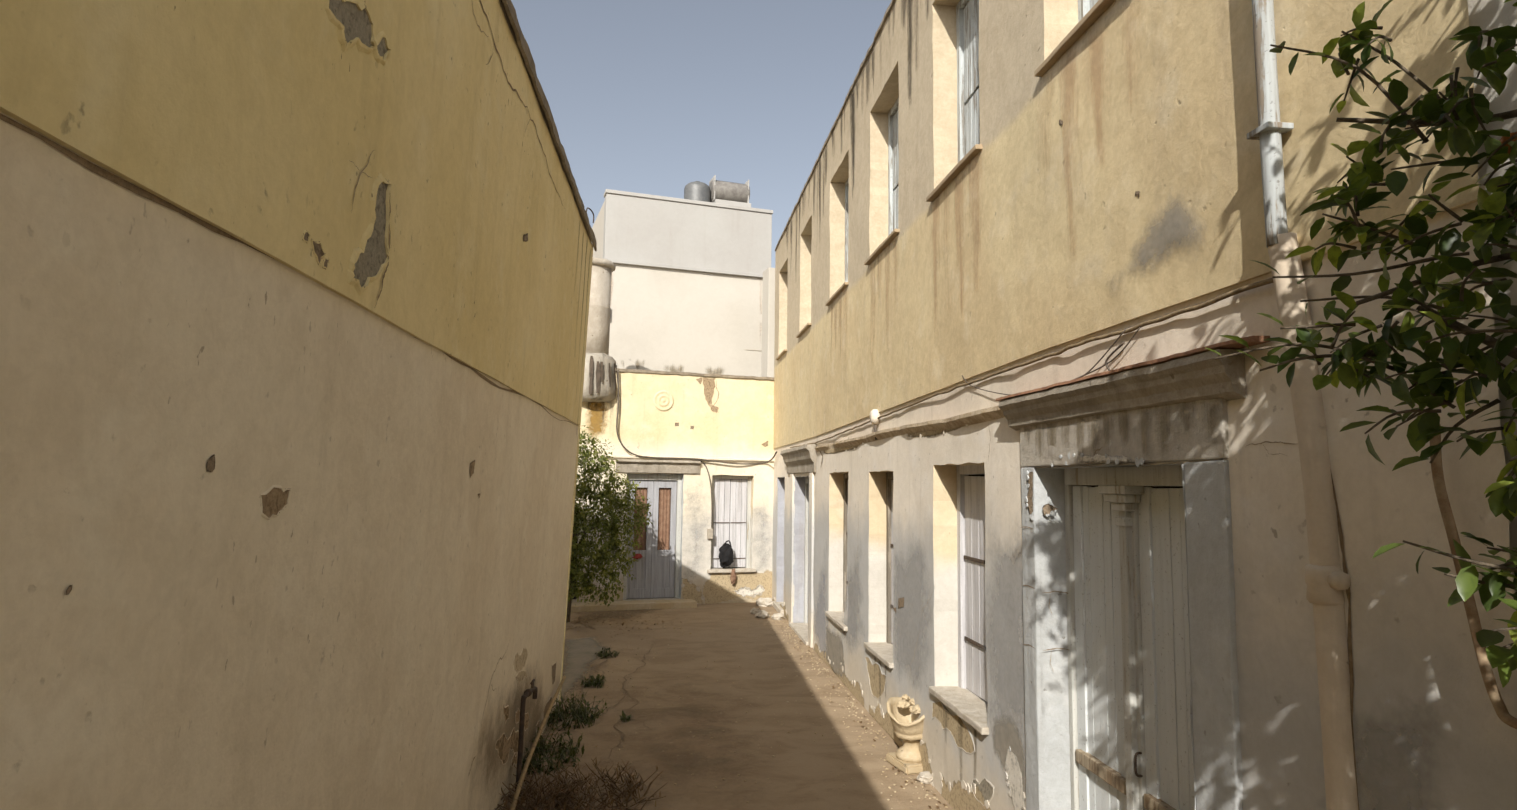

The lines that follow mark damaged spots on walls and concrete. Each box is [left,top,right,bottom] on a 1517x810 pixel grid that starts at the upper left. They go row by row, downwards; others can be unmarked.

flaking render [324,0,391,66]
crack [472,0,563,205]
crack [0,113,276,260]
flaking render [302,230,330,269]
flaking render [347,173,392,296]
crack [415,337,578,426]
flaking render [260,485,291,520]
leakage [487,688,540,771]